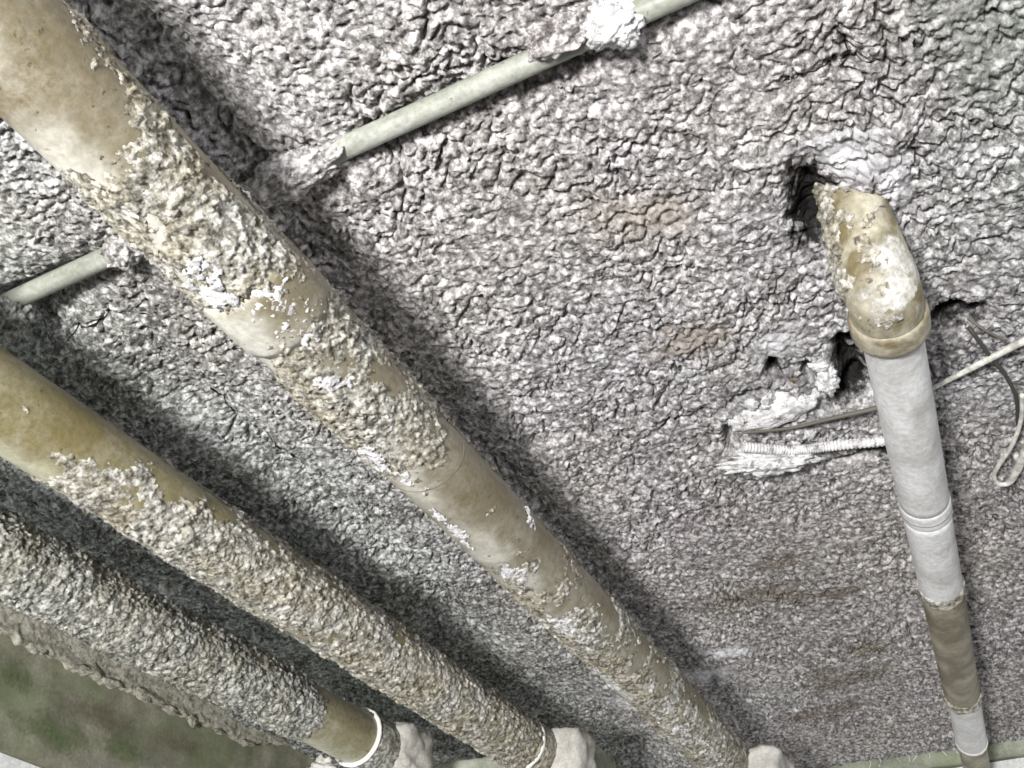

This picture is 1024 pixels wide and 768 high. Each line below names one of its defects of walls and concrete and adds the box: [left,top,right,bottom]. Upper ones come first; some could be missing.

spalling [773,153,837,260]
spalling [718,331,870,446]